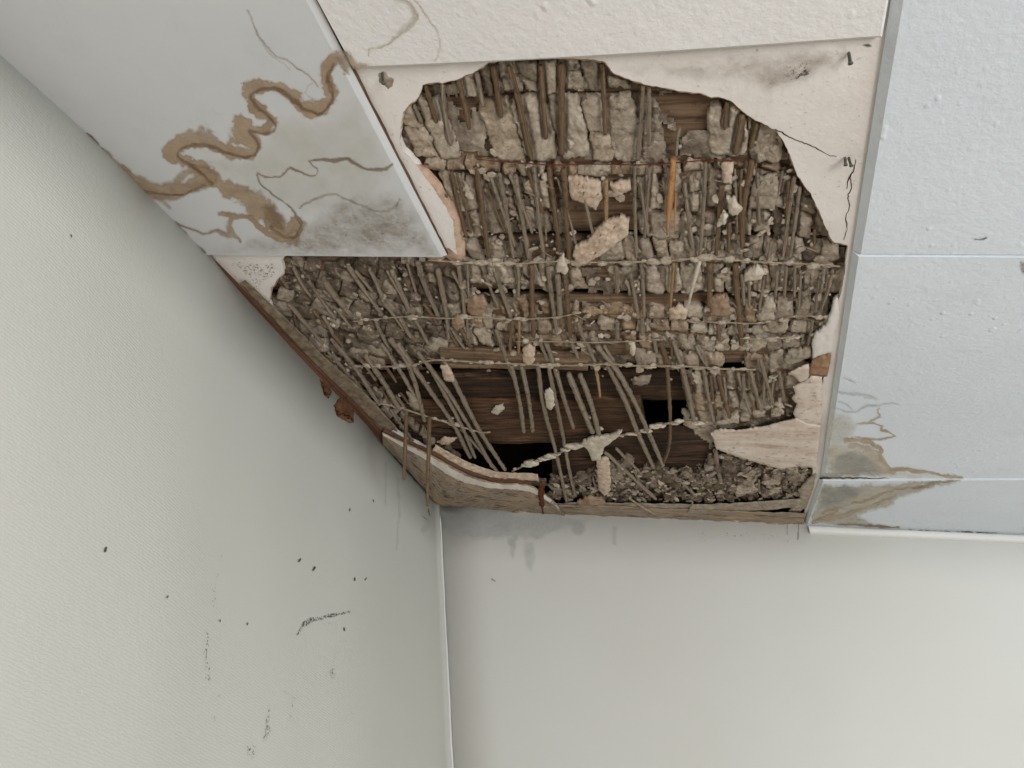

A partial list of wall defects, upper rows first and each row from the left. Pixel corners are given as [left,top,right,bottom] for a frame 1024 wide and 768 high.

leakage [88,51,407,253]
flaking render [269,58,848,511]
crack [775,129,856,238]
leakage [812,408,963,528]